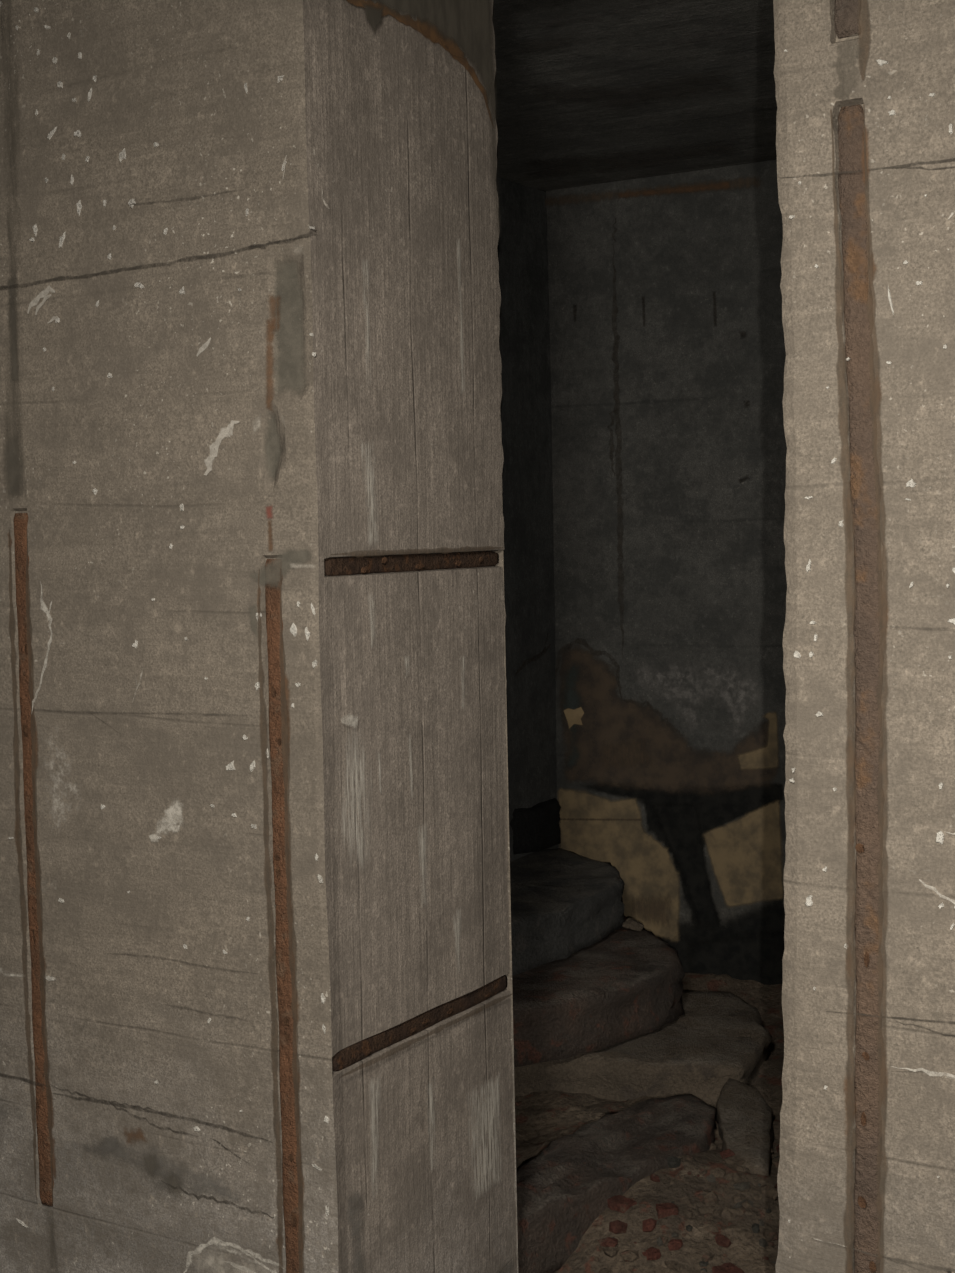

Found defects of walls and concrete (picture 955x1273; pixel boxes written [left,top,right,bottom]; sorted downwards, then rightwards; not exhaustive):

crack [0,230,316,290]
rust [324,546,504,576]
rust [830,0,888,1273]
rust [8,513,55,1206]
rust [258,507,304,1273]
rust [332,975,512,1078]
crack [0,1073,273,1163]
crack [161,1180,274,1218]